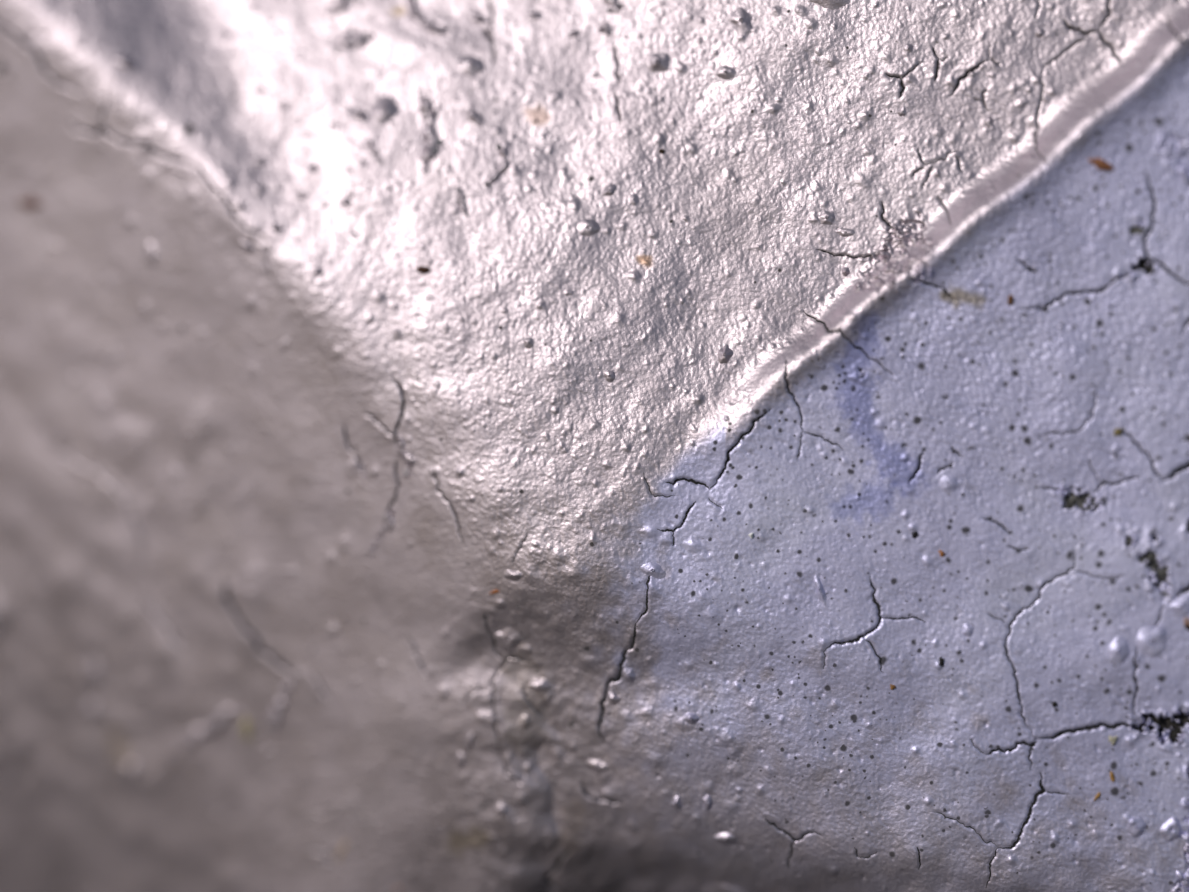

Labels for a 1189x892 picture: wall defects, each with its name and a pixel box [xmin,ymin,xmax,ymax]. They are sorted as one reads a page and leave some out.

crack [1034,0,1122,170]
crack [1019,170,1189,311]
crack [342,376,405,557]
crack [433,470,465,545]
crack [643,360,843,545]
crack [983,518,1029,551]
spalling [1058,485,1103,512]
crack [1089,426,1189,493]
crack [599,576,650,744]
crack [823,578,926,672]
crack [933,547,1189,887]
spalling [1130,708,1189,744]